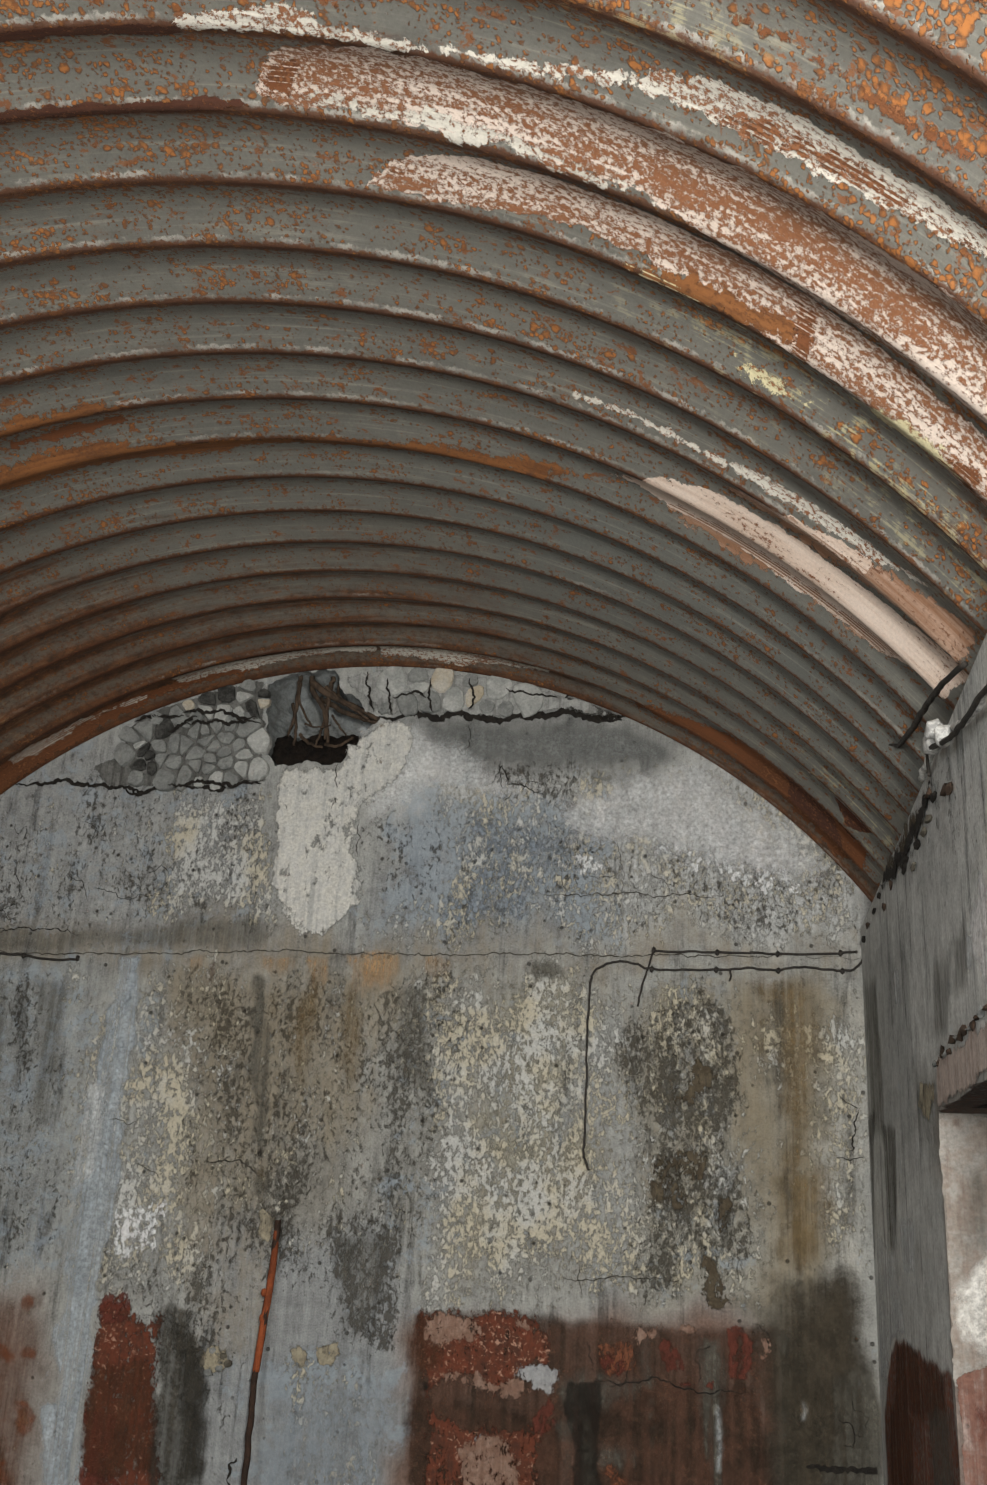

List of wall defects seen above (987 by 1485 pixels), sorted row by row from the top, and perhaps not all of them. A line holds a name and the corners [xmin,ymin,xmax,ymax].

corrosion [0,95,250,123]
peeling [171,1,987,507]
corrosion [0,399,591,491]
peeling [572,391,984,701]
corrosion [0,646,549,795]
peeling [94,666,619,936]
crack [379,695,625,750]
crack [491,765,543,799]
corrosion [631,702,872,871]
damp [935,879,987,1026]
damp [41,924,257,1485]
damp [770,982,914,1485]